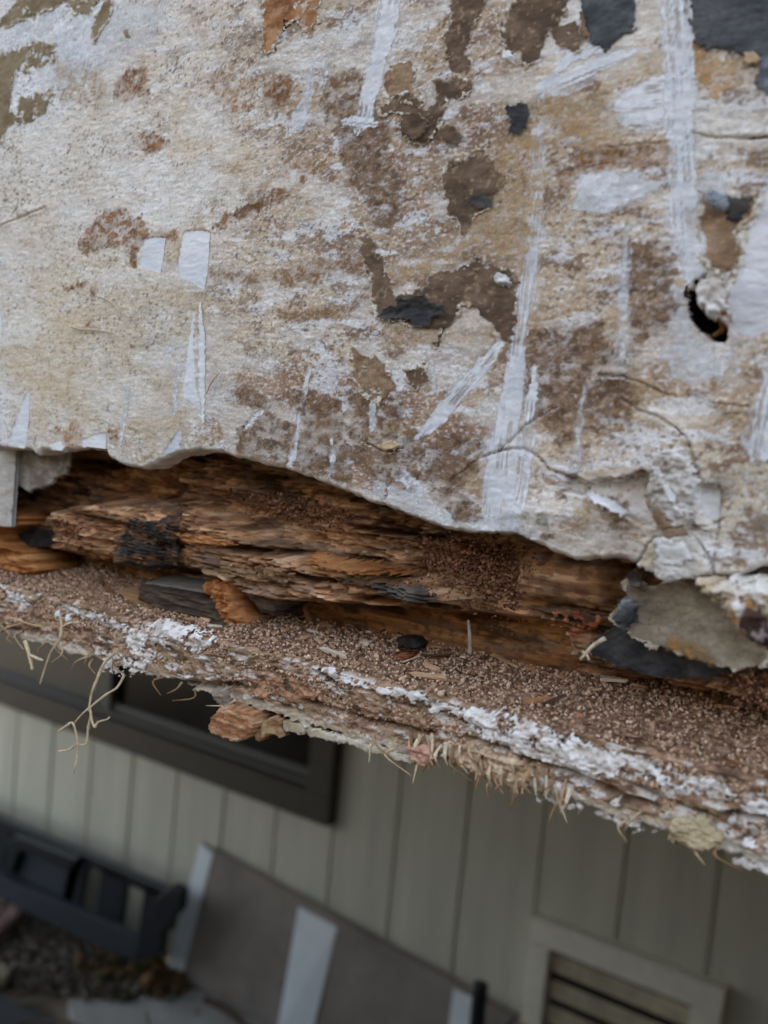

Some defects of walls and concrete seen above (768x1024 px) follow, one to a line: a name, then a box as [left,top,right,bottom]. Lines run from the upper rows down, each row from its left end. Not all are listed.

spalling [414,124,550,531]
spalling [83,432,106,449]
spalling [570,465,657,526]
spalling [695,485,721,532]
flaking render [3,587,30,609]
flaking render [54,585,218,677]